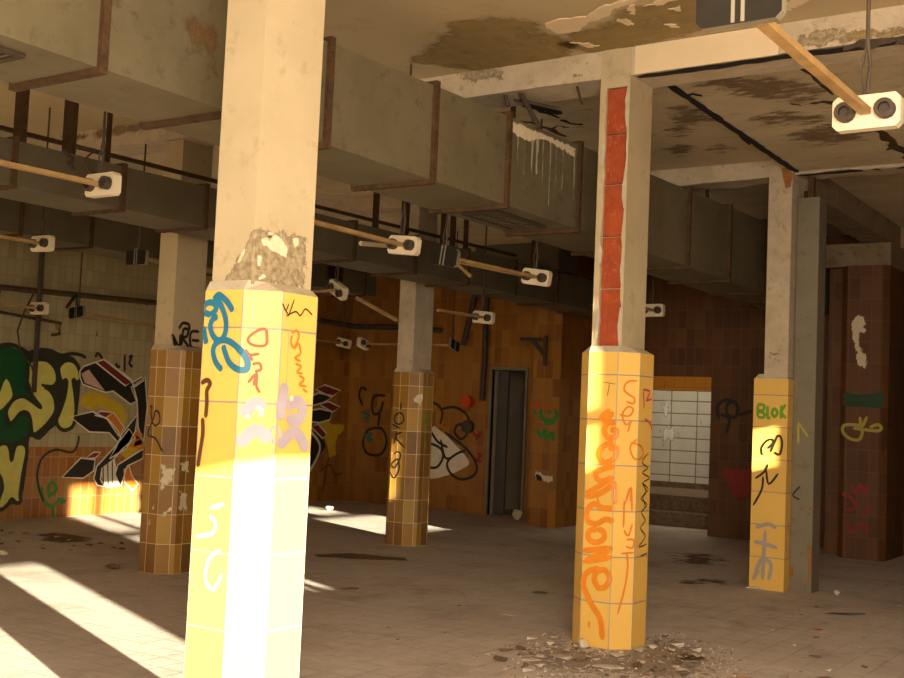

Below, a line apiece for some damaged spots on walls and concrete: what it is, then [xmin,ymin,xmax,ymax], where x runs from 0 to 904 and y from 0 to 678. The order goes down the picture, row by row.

leakage [412,0,702,71]
peeling [545,0,681,48]
leakage [513,122,576,206]
leakage [664,106,713,154]
crack [637,36,904,176]
leakage [696,76,868,145]
spalling [225,228,307,288]